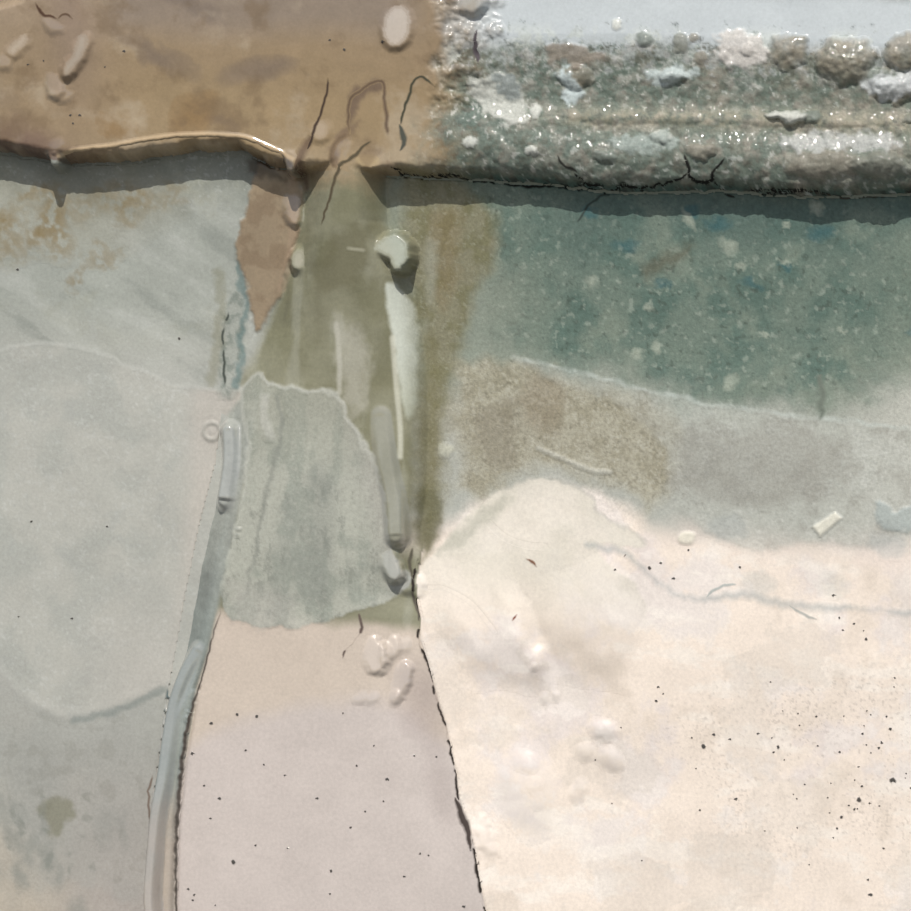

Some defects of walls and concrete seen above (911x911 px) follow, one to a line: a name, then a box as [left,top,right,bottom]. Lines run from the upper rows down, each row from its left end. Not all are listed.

crack [288,75,911,226]
crack [220,312,230,385]
crack [525,558,538,568]
crack [407,548,488,911]
water stain [0,695,167,911]
water stain [172,735,194,799]
water stain [165,824,183,867]